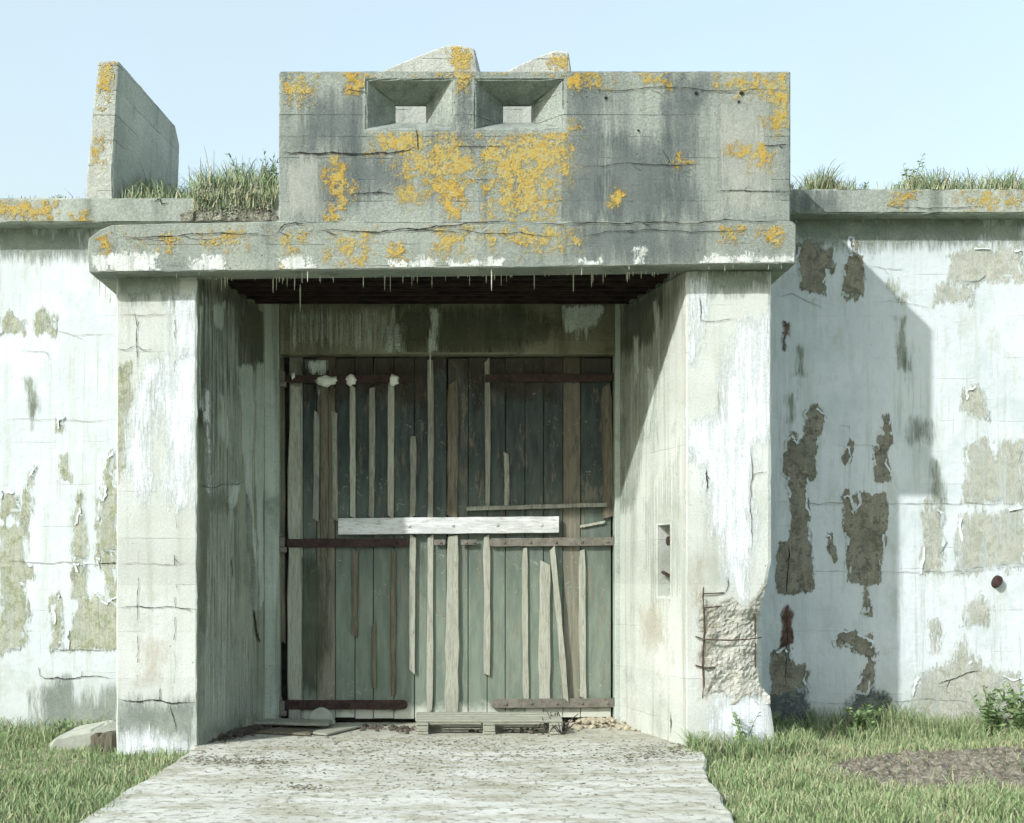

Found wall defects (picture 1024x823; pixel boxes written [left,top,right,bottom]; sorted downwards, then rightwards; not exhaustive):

crack [287,126,418,155]
crack [602,149,701,170]
crack [119,219,791,241]
peeling [796,236,868,302]
peeling [933,245,1024,308]
peeling [918,437,1024,577]
peeling [0,465,38,657]
peeling [49,450,126,654]
spalling [695,403,893,704]
crack [5,555,198,727]
corrosion [780,605,794,649]